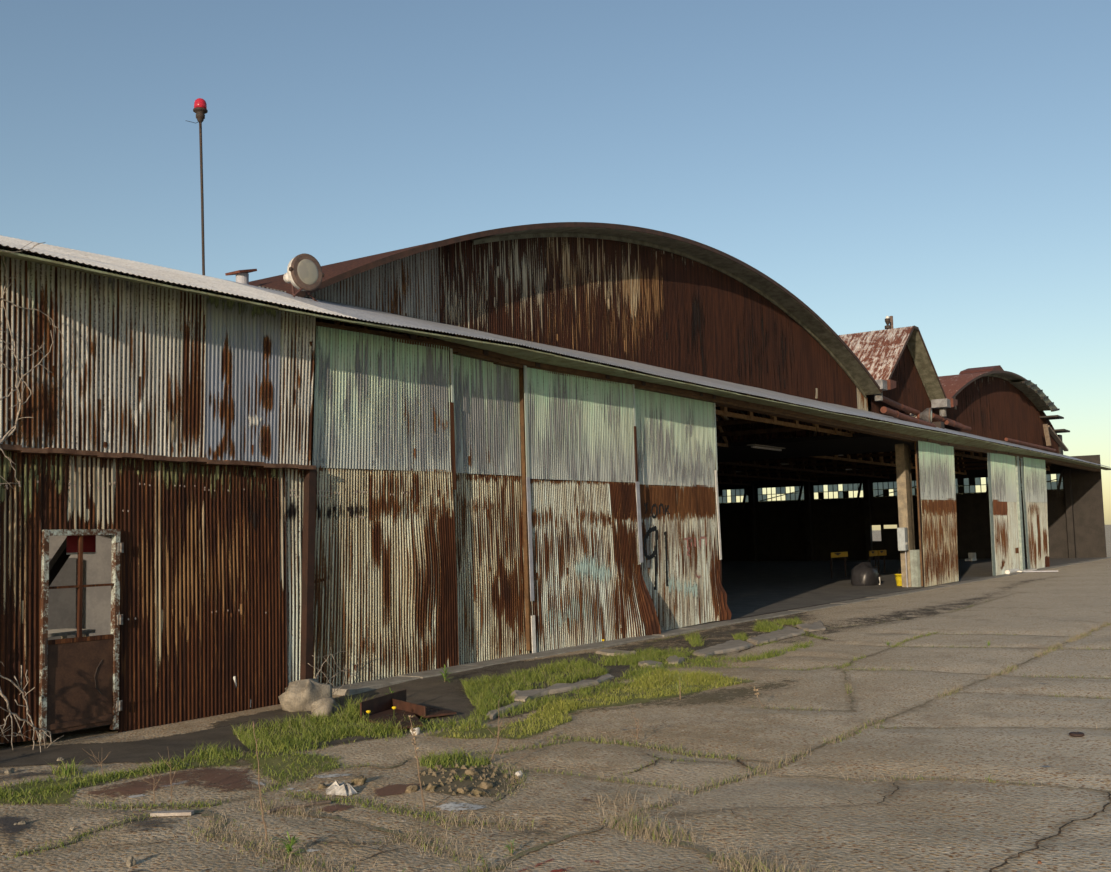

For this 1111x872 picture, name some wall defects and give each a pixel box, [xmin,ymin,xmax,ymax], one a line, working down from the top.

rust [0,247,721,687]
rust [922,498,958,586]
rust [993,500,1050,570]
crack [606,752,753,774]
crack [313,836,398,864]
crack [989,793,1111,872]